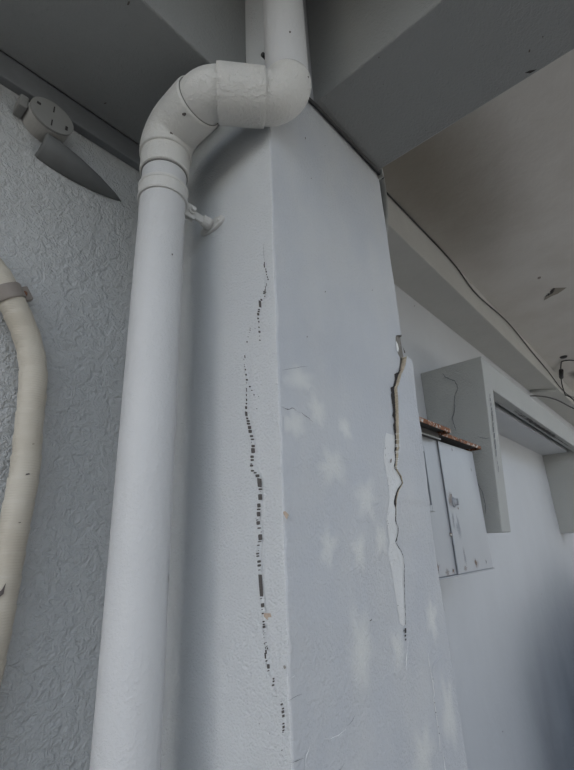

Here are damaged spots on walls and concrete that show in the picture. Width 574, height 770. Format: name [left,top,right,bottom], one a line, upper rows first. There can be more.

crack [391,356,444,664]